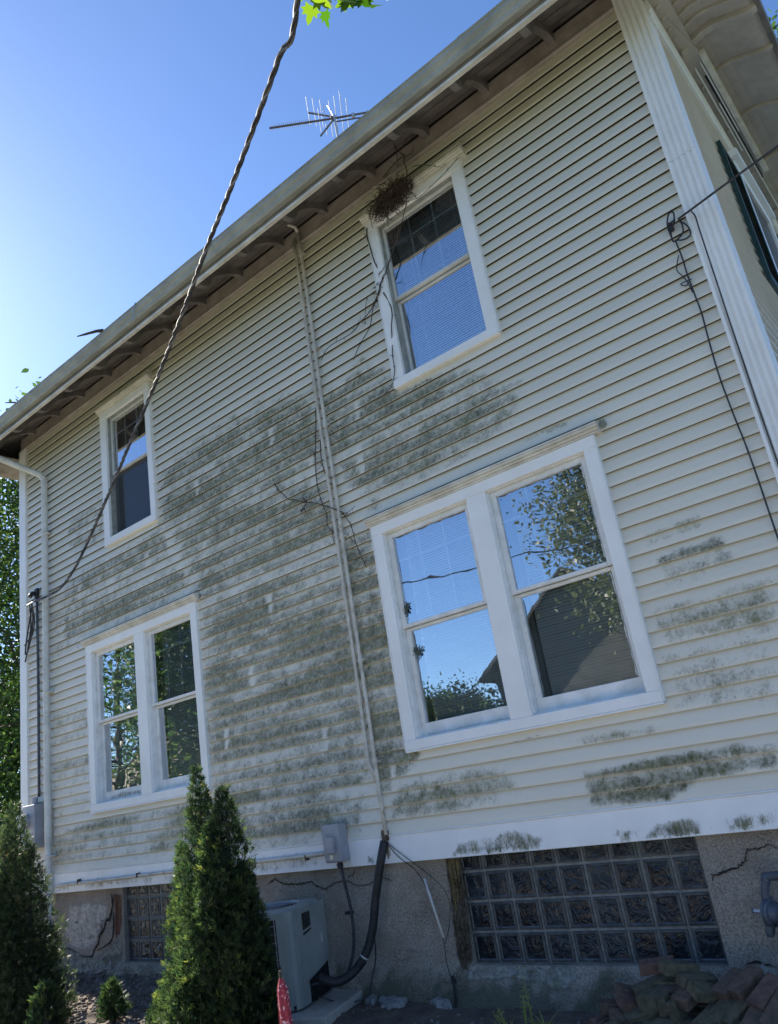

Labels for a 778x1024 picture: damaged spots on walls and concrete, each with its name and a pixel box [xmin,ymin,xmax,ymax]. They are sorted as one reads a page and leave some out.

leakage [324,359,514,487]
leakage [660,539,724,566]
leakage [56,401,420,840]
leakage [393,773,510,812]
leakage [588,747,775,803]
leakage [647,819,700,838]
crack [267,868,393,892]
leakage [446,833,540,969]
crack [711,844,777,881]
crack [60,894,114,975]